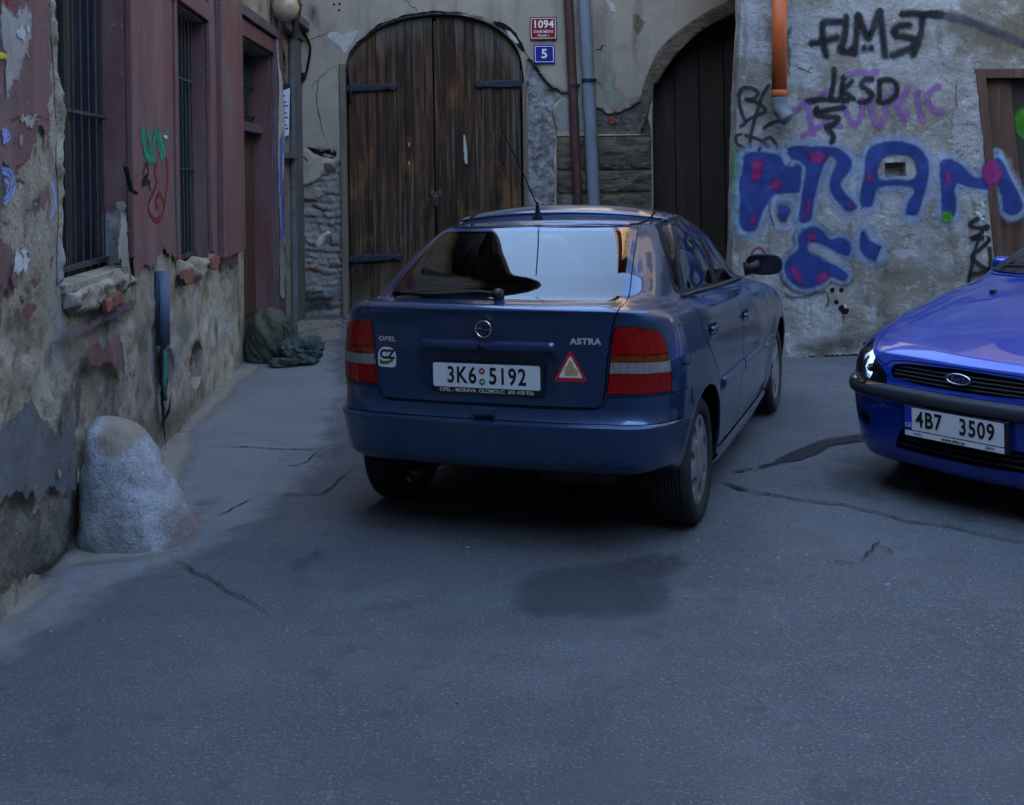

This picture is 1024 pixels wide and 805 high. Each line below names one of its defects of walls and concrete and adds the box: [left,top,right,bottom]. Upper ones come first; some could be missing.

spalling [0,0,67,322]
spalling [82,200,132,312]
flaking render [304,148,343,316]
crack [312,0,567,141]
spalling [525,60,568,206]
peeling [87,333,125,414]